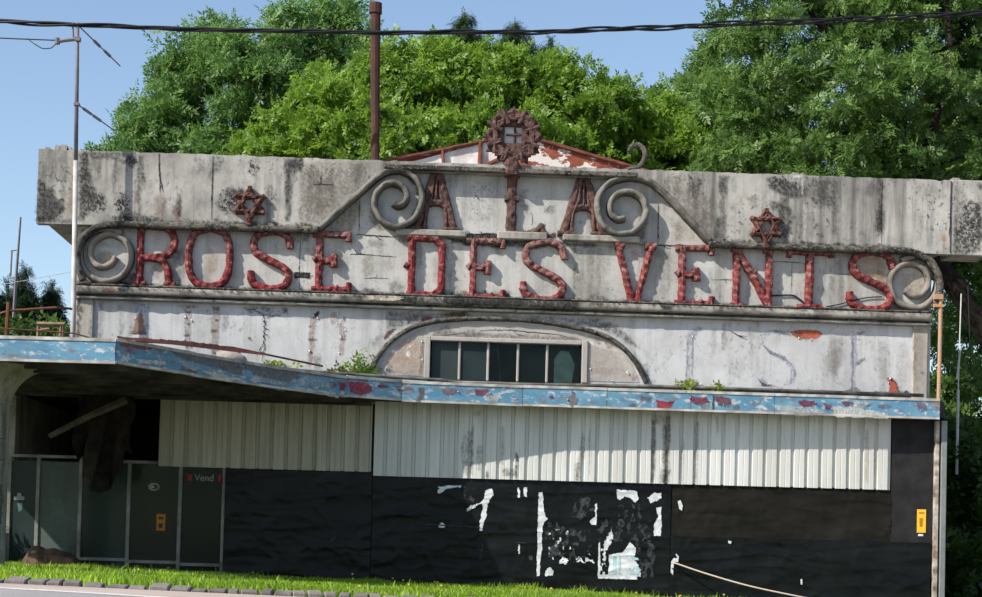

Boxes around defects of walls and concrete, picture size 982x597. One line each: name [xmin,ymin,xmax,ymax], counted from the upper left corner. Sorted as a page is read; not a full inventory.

leakage [37,183,65,222]
leakage [78,153,180,222]
leakage [196,159,320,270]
leakage [449,238,546,249]
leakage [768,175,838,244]
mould [954,201,982,253]
leakage [76,273,707,341]
crack [246,309,277,361]
peeling [761,329,823,384]
peeling [630,396,673,408]
peeling [775,400,889,419]
peeling [887,378,899,393]